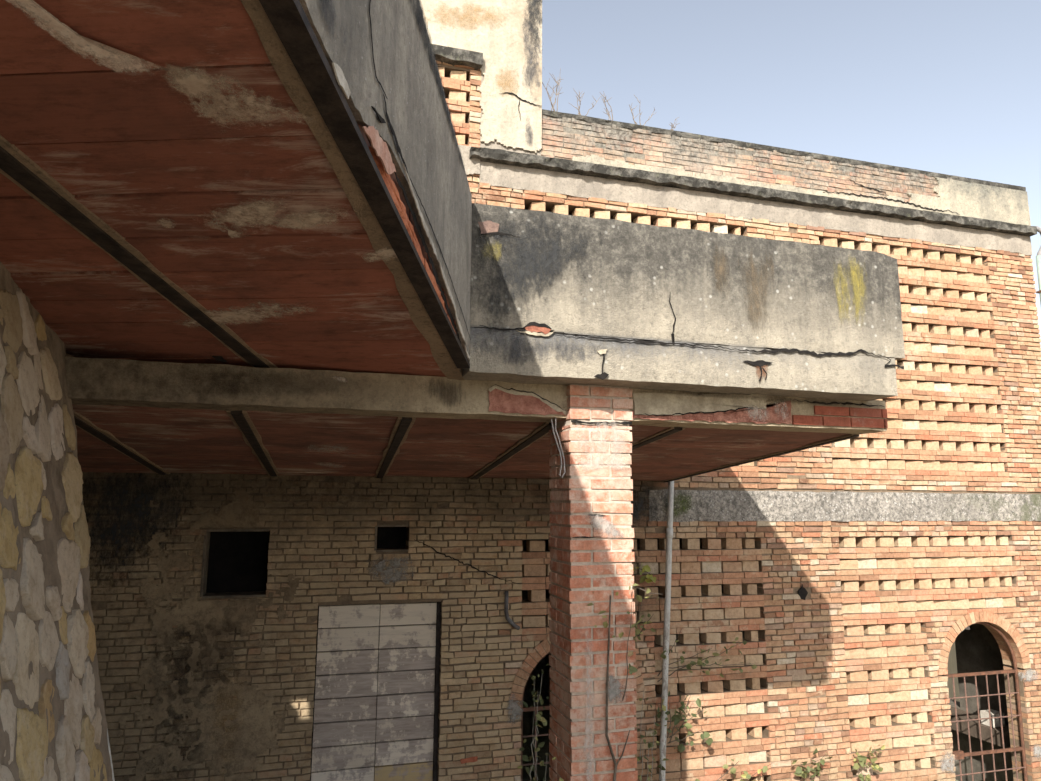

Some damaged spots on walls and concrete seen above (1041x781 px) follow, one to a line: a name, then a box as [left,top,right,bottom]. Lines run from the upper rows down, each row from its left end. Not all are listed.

peeling [332,62,350,99]
crack [501,92,540,121]
crack [369,0,527,340]
crack [825,178,958,214]
spalling [516,322,554,337]
crack [553,297,904,381]
peeling [488,384,567,416]
peeling [632,393,888,428]
water stain [84,473,189,582]